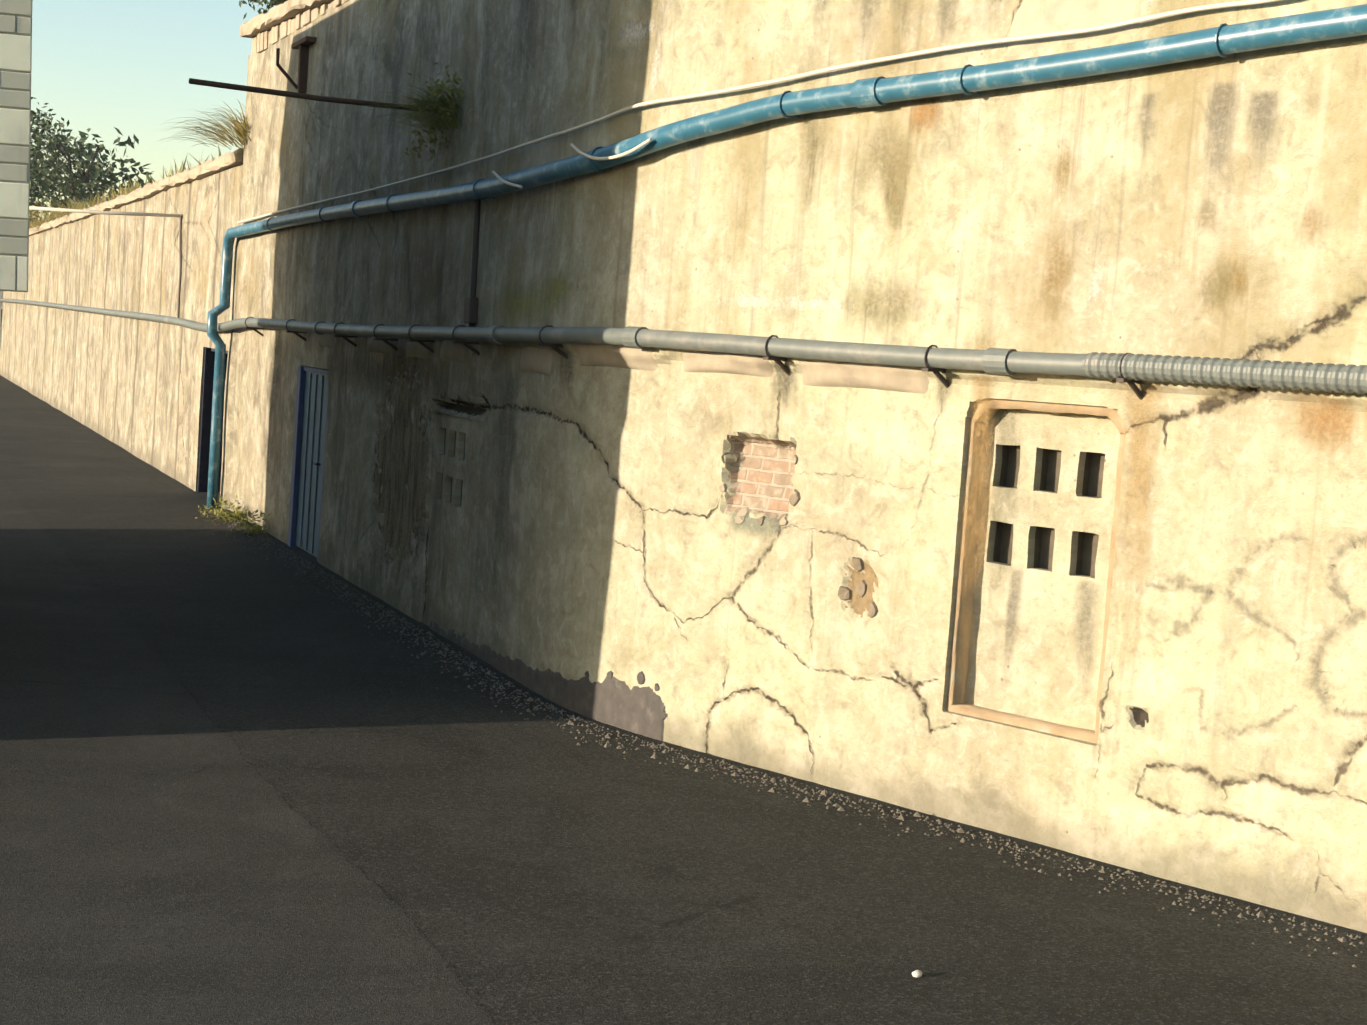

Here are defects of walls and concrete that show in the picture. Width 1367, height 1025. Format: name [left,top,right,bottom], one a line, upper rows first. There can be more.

crack [1130,297,1366,445]
spalling [719,433,801,526]
crack [490,404,956,732]
spalling [838,556,879,618]
crack [705,669,813,771]
crack [1096,664,1113,772]
spalling [1129,707,1149,727]
crack [1136,742,1367,837]